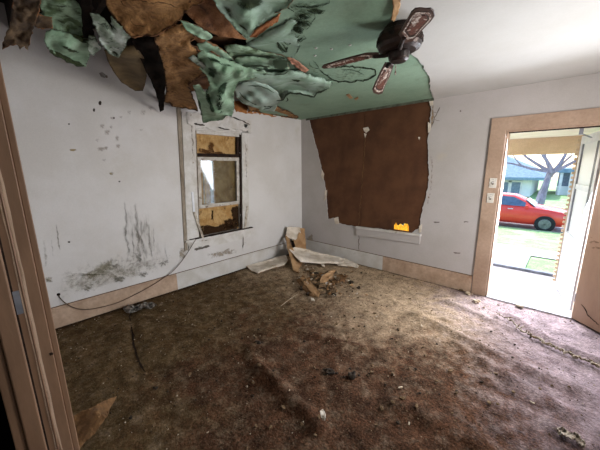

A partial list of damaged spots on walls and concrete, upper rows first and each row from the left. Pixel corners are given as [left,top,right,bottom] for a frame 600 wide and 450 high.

peeling [40,0,90,67]
peeling [180,0,433,233]
damp [90,261,123,282]